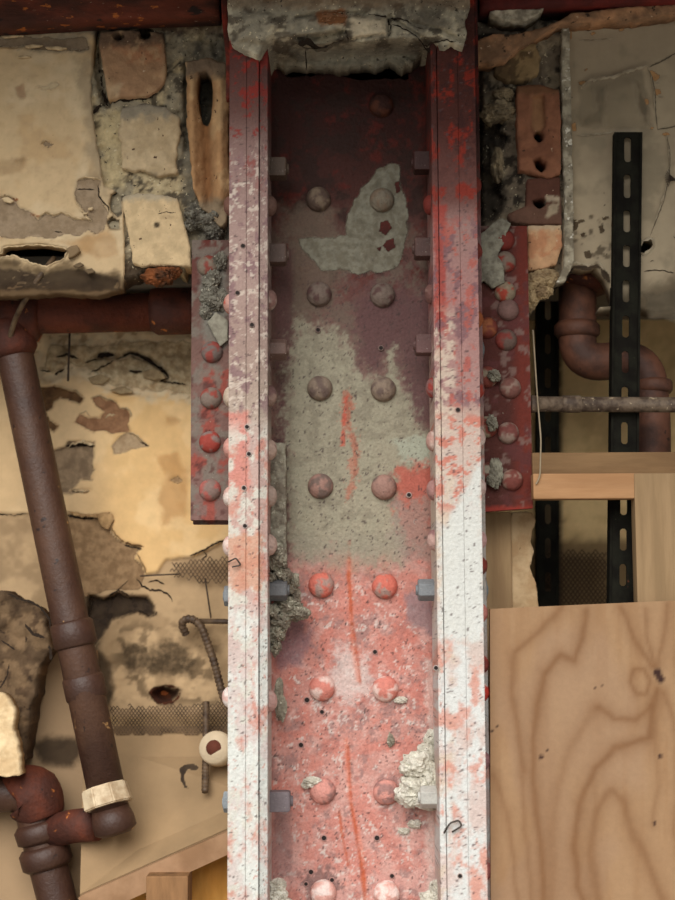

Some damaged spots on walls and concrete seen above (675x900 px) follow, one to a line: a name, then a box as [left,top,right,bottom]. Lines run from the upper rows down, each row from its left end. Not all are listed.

spalling [227,0,470,80]
crack [295,13,456,69]
flaking render [0,176,119,291]
peeling [299,163,409,275]
crack [41,352,186,385]
spalling [41,341,191,454]
flaking render [54,440,95,493]
crack [190,540,224,560]
crack [117,578,172,599]